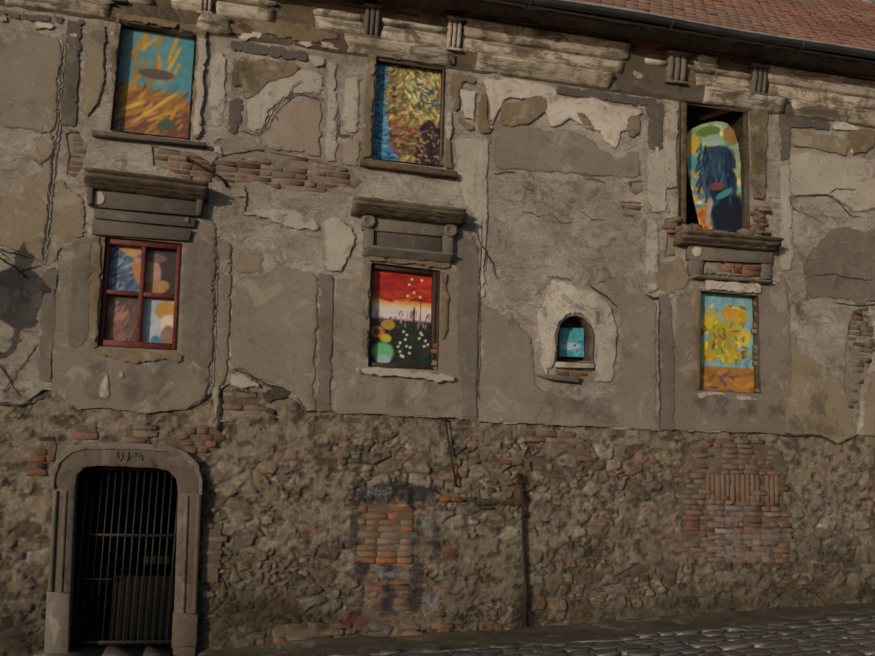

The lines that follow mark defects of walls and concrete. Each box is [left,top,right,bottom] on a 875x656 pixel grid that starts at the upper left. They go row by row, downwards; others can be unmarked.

crack [244,80,351,136]
flaking render [445,73,642,148]
spalling [152,147,362,196]
crack [0,344,39,420]
flaking render [99,372,123,398]
spalling [221,373,291,421]
spalling [844,308,875,440]
spalling [26,433,57,476]
spalling [120,424,225,454]
spalling [273,502,461,643]